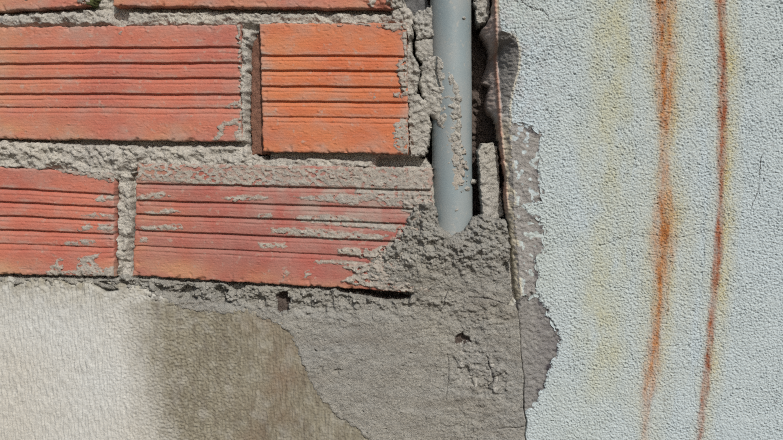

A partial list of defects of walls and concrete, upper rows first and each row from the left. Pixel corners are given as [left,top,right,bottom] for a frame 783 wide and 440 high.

spalling [498,31,519,112]
peeling [507,123,561,412]
corrosion [618,0,746,440]
damp [109,294,368,440]
spalling [457,340,505,395]